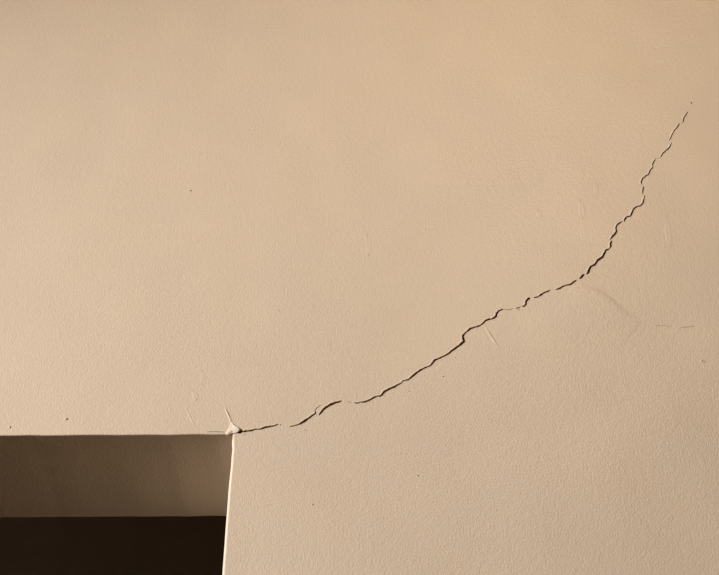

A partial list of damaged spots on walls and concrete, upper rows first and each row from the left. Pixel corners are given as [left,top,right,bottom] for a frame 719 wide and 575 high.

crack [210,102,692,435]